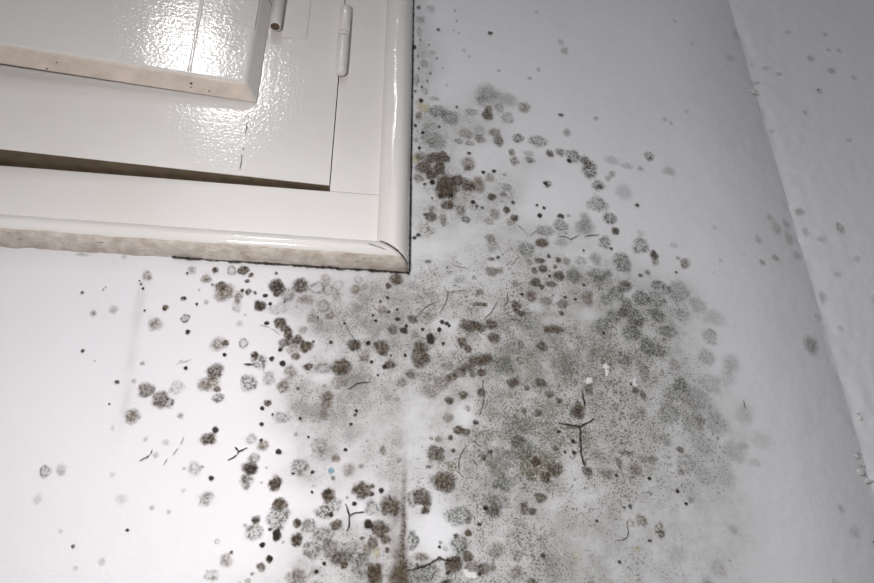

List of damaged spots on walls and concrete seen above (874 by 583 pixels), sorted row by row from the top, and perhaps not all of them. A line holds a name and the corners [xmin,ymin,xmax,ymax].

damp [139,384,174,407]
damp [199,41,732,583]